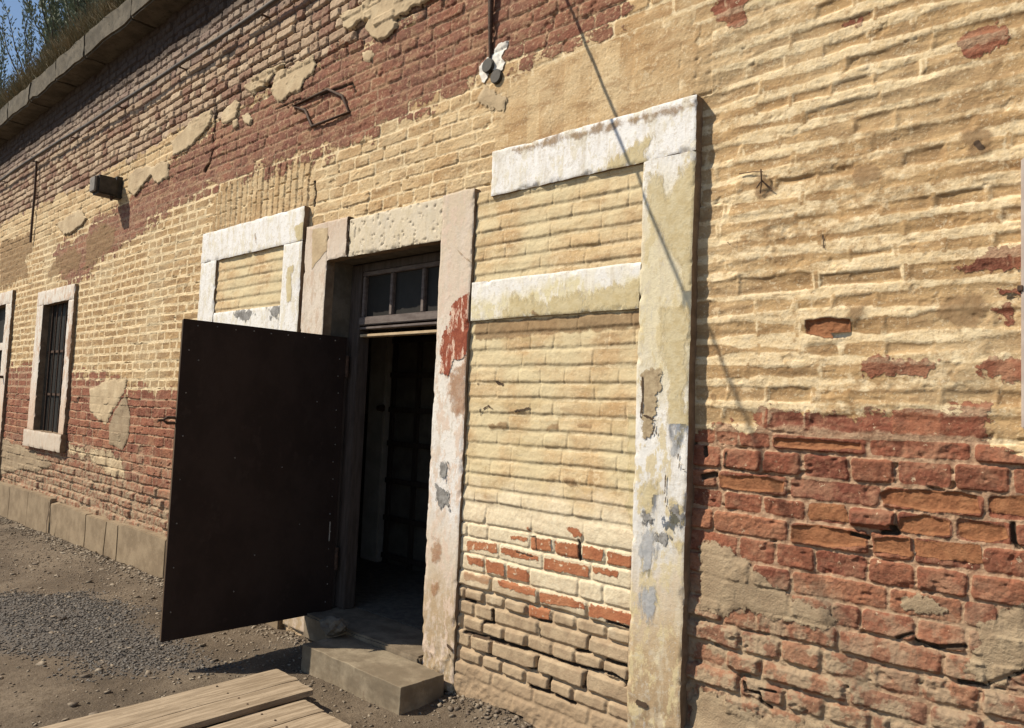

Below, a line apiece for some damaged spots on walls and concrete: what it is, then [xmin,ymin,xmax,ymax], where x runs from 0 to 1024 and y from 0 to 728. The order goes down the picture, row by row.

peeling [956,20,1010,59]
peeling [53,0,633,285]
peeling [953,243,1021,273]
peeling [0,360,177,537]
peeling [464,527,632,625]
peeling [639,305,1024,728]